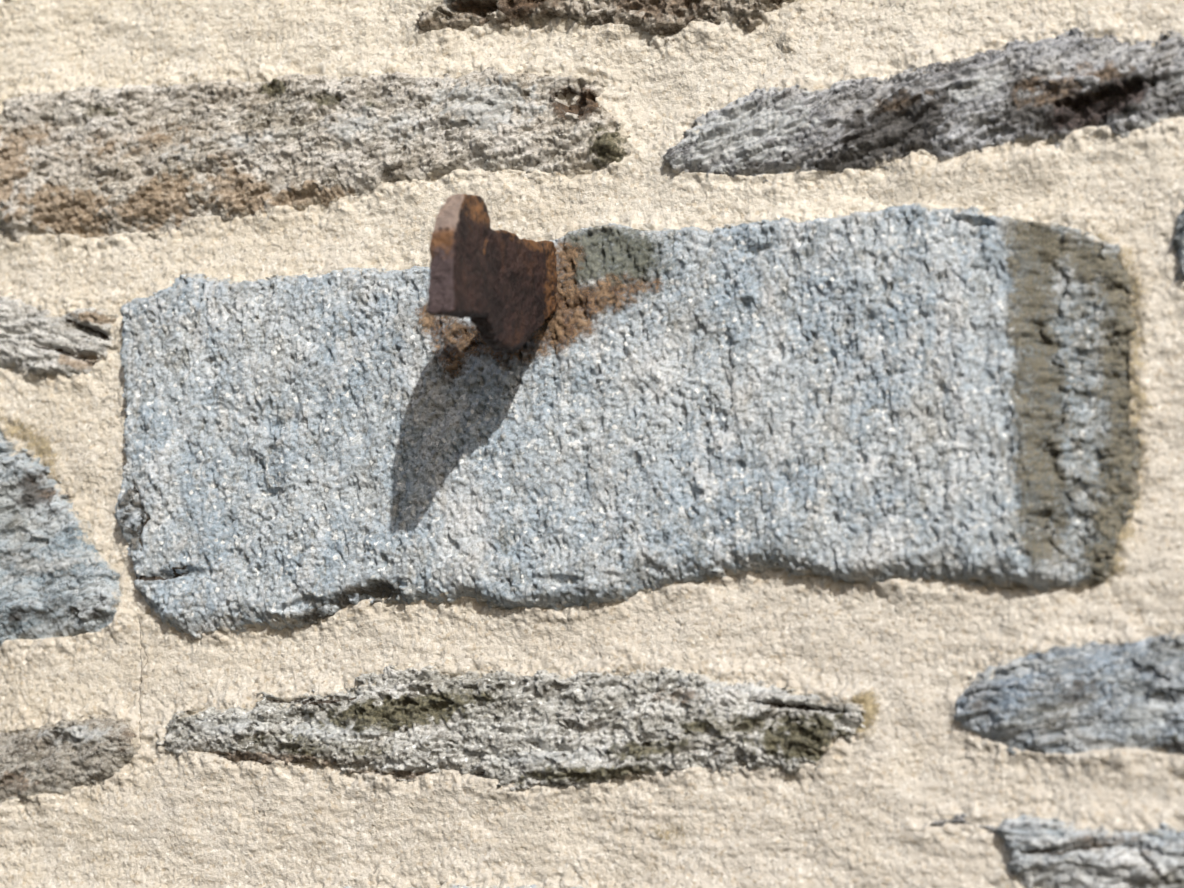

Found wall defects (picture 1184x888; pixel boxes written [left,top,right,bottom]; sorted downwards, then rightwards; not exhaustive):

rust [418,243,663,377]